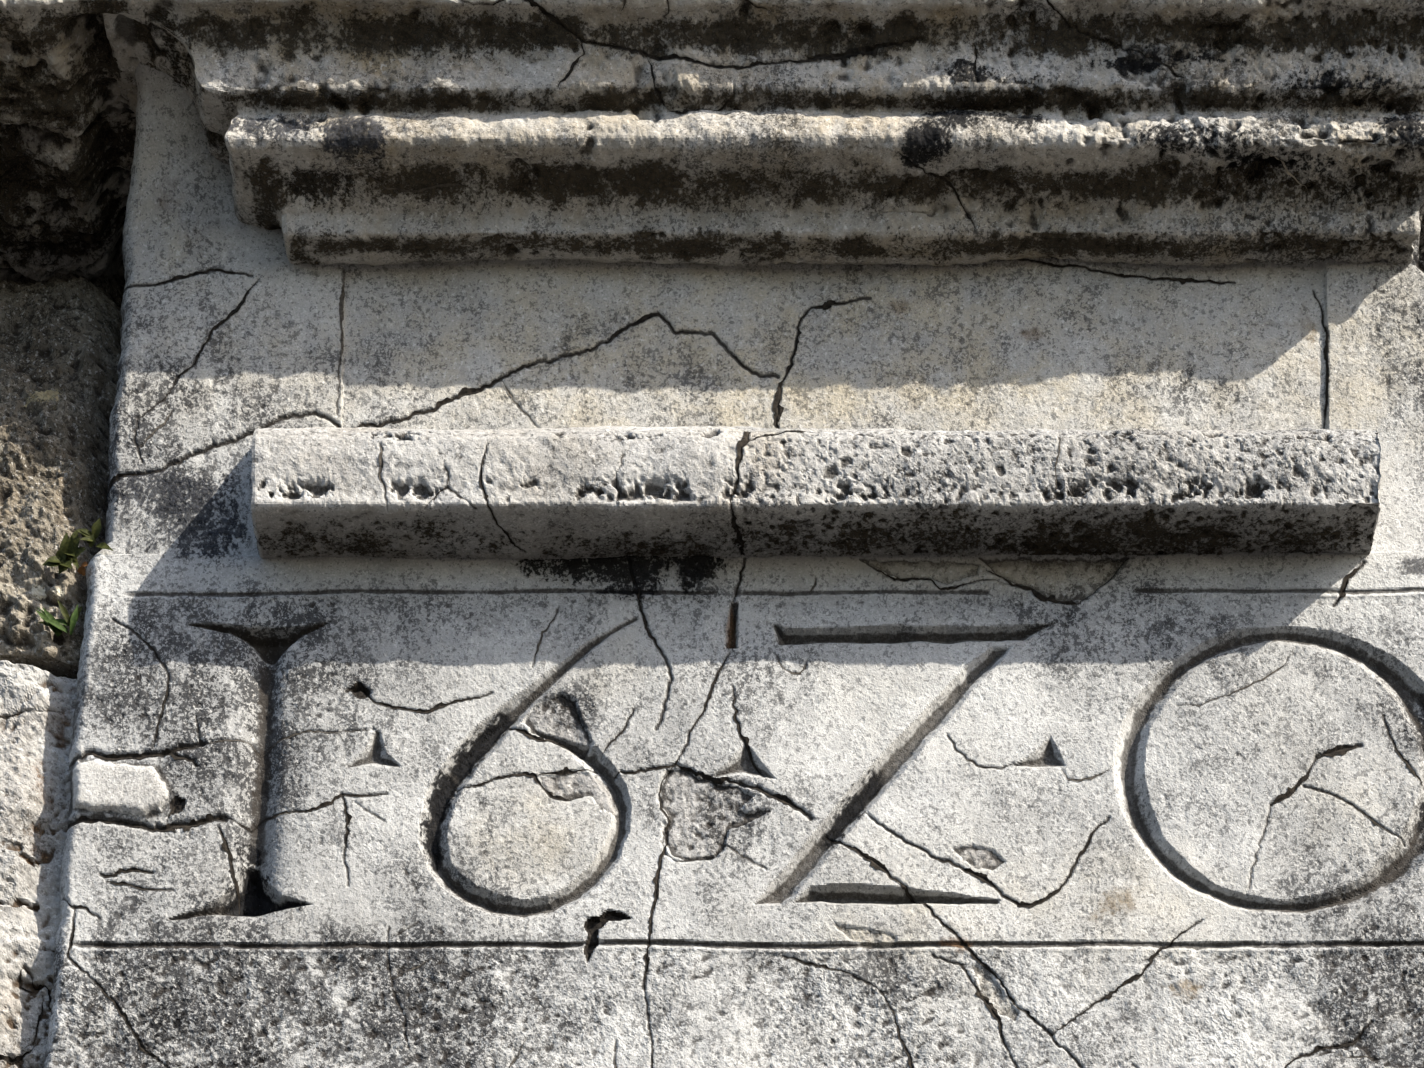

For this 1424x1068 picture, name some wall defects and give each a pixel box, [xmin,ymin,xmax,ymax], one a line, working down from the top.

leakage [944,59,1052,86]
leakage [1090,41,1256,77]
leakage [227,113,388,205]
leakage [899,109,1048,169]
leakage [1131,102,1424,174]
crack [107,269,869,603]
crack [71,623,490,766]
crack [67,794,379,914]
spalling [661,770,763,862]
crack [458,571,1192,1068]
crack [1249,726,1424,888]
crack [64,867,167,1067]